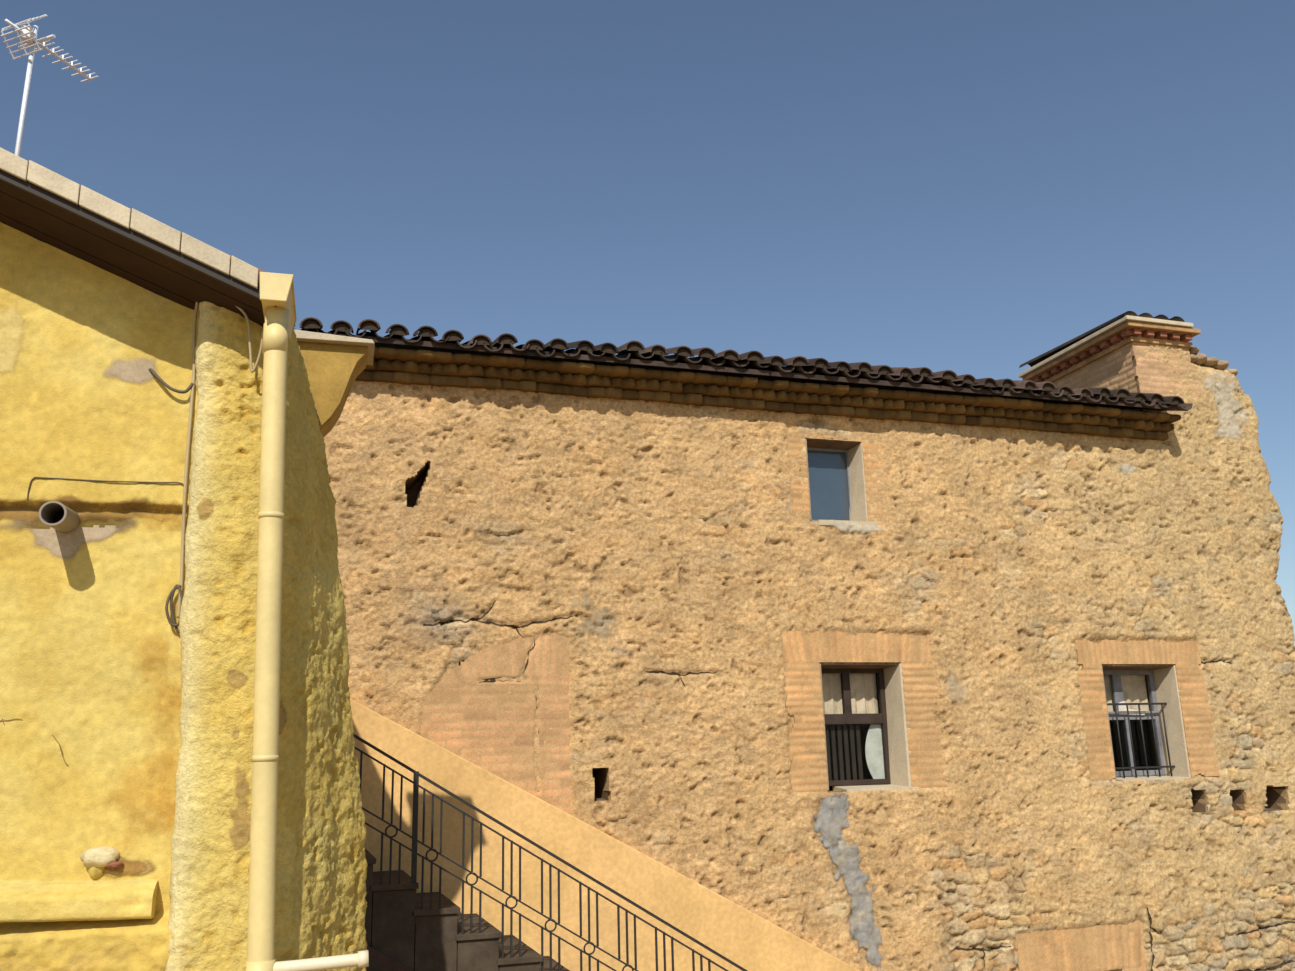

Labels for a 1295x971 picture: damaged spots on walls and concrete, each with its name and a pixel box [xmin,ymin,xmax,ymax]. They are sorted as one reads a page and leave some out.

spalling [405,463,430,507]
crack [423,601,577,734]